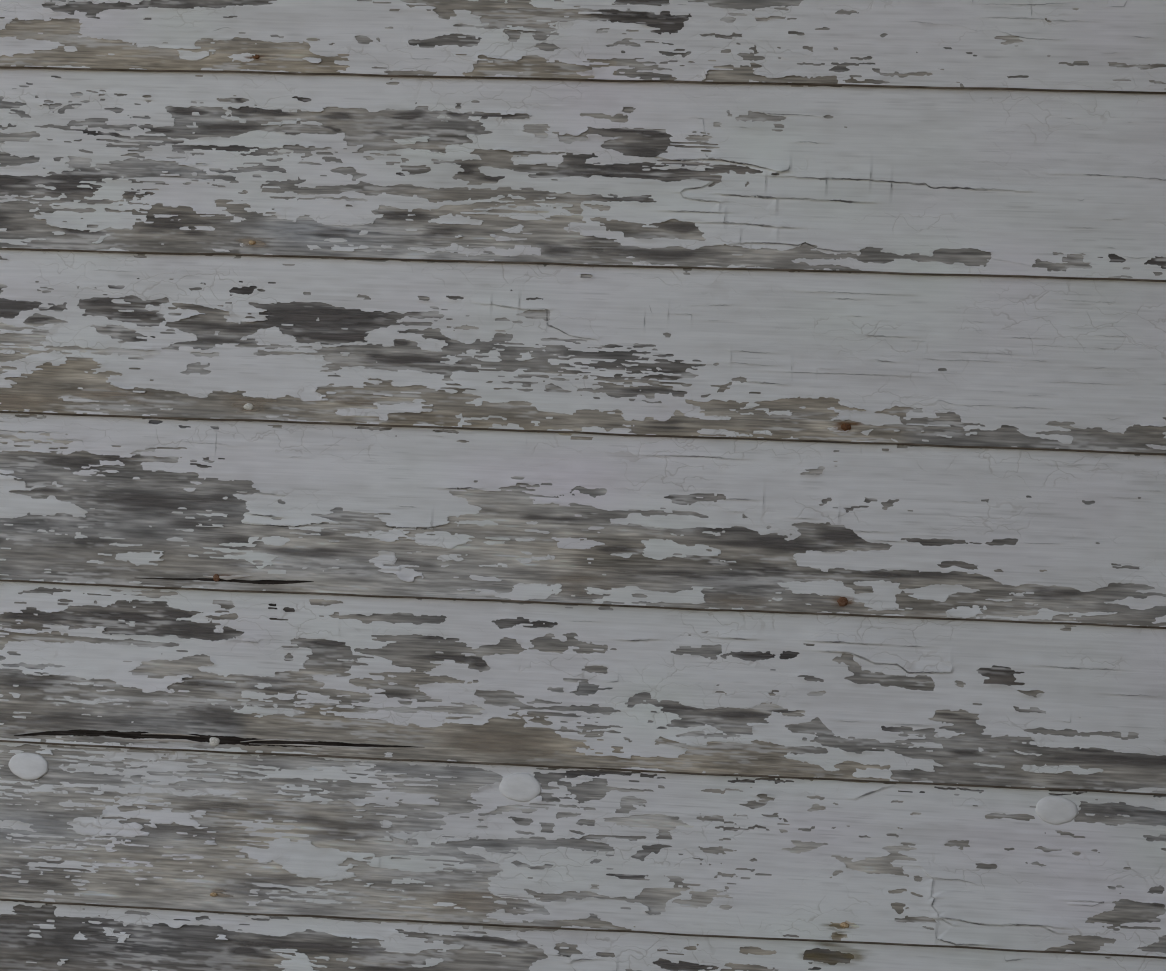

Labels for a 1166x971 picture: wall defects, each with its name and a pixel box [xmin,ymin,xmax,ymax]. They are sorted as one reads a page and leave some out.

peeling [0,0,350,78]
peeling [355,0,944,87]
spalling [994,35,1024,47]
spalling [1047,55,1089,66]
spalling [1108,62,1166,90]
peeling [0,82,992,278]
peeling [0,281,1166,971]